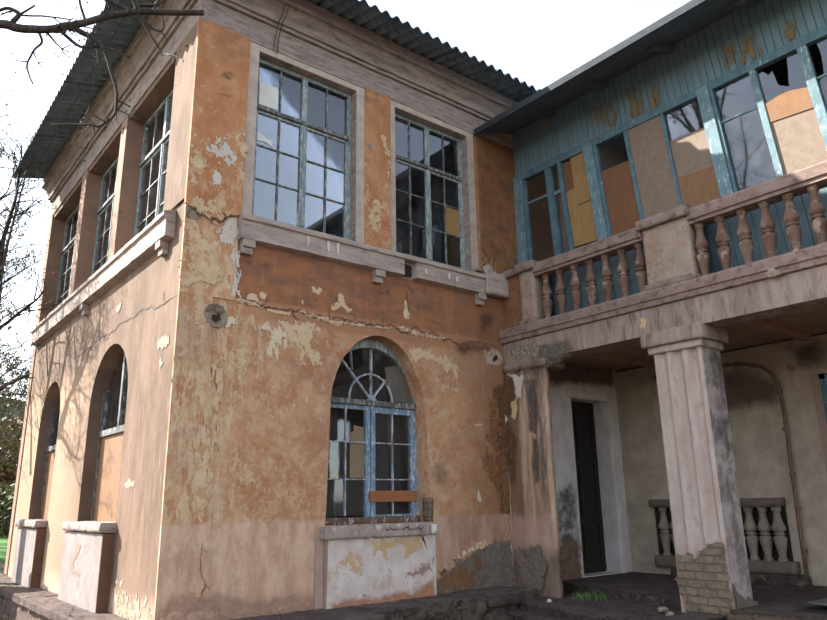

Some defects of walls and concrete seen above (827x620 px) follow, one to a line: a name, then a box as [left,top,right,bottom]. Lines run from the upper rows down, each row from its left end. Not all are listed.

peeling [721,31,762,71]
peeling [178,125,460,530]
crack [238,290,501,349]
peeling [157,334,188,370]
peeling [483,347,503,366]
flaking render [480,373,524,514]
peeling [339,552,363,576]
peeling [369,535,423,561]
flaking render [405,539,547,594]
water stain [560,535,582,580]
flaking render [674,541,759,619]